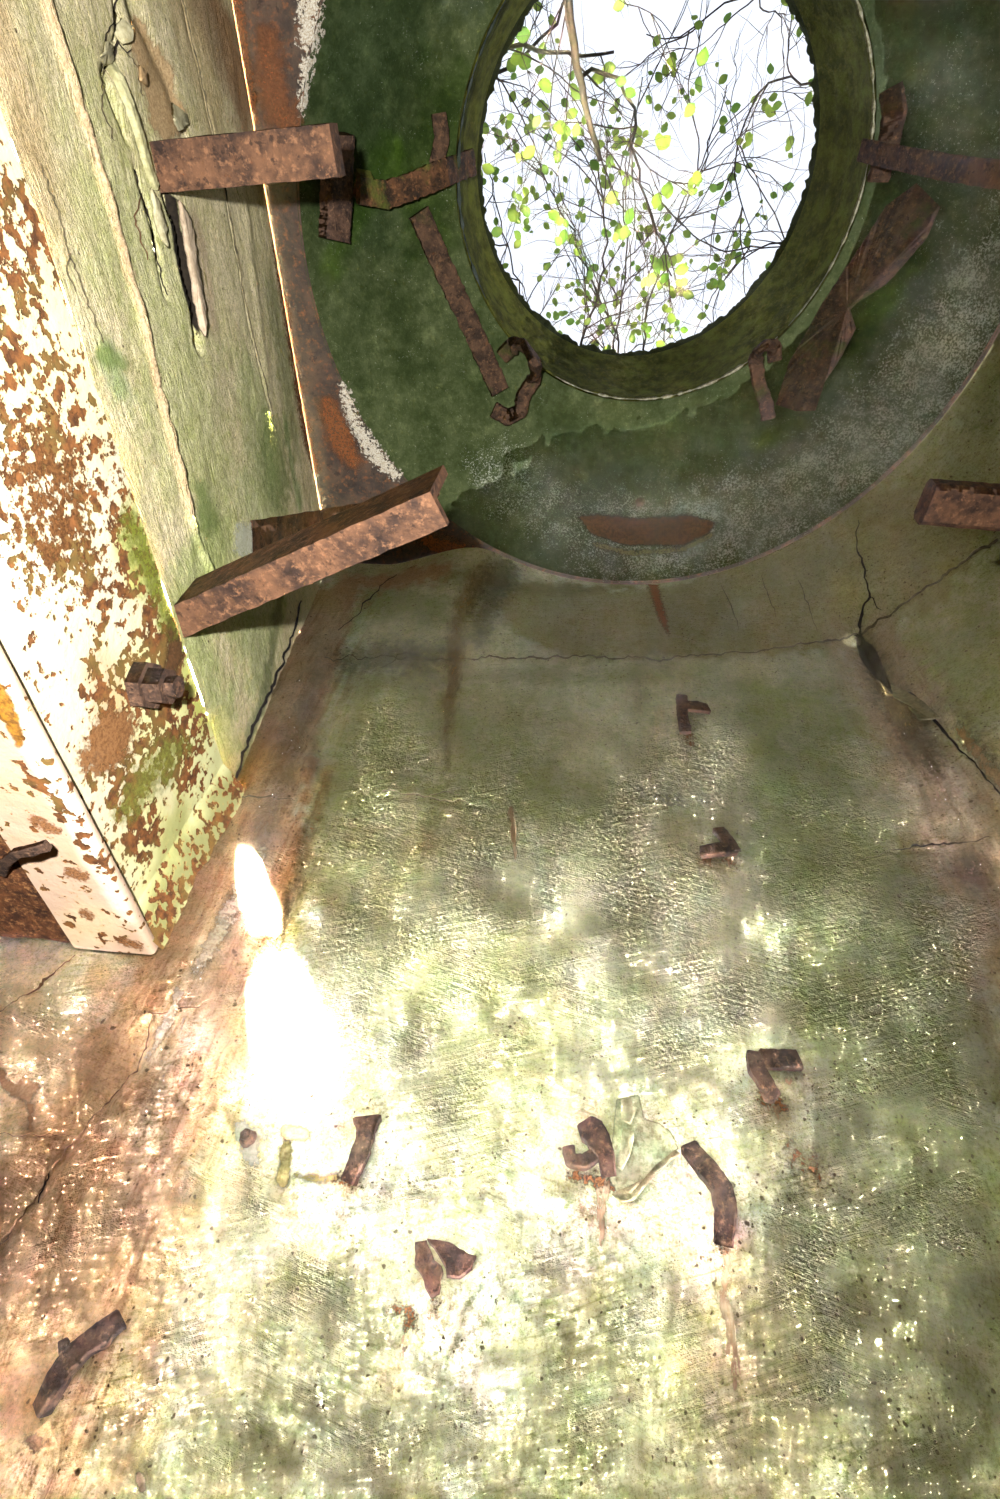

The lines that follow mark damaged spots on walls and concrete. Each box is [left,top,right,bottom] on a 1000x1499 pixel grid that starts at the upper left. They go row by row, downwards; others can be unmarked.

flaking render [131,15,189,140]
spalling [150,188,207,336]
corrosion [164,618,184,672]
crack [394,520,1000,794]
corrosion [0,684,23,747]
corrosion [77,698,143,781]
crack [235,600,302,801]
corrosion [28,815,62,835]
corrosion [63,867,90,882]
crack [853,836,989,863]
crack [0,955,75,1012]
crack [0,999,213,1245]